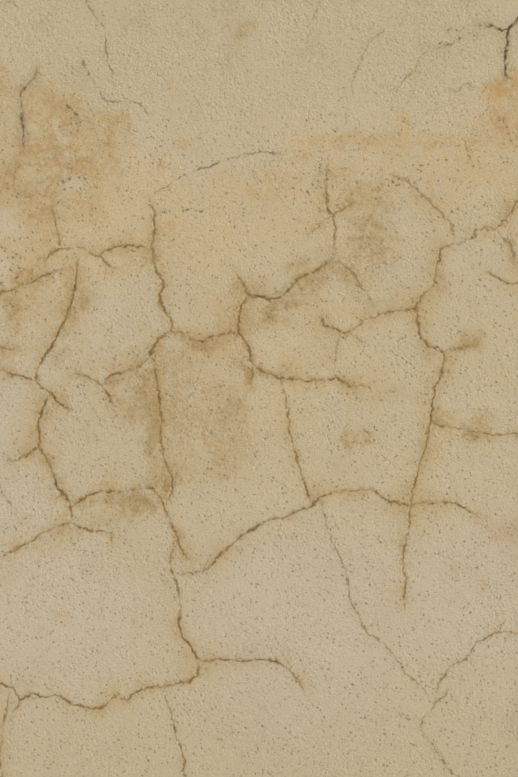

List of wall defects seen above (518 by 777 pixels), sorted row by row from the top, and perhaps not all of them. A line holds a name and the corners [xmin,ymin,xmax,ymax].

crack [0,62,42,204]
crack [80,0,150,116]
crack [192,150,283,173]
crack [344,27,386,126]
crack [388,13,518,93]
crack [0,160,518,777]